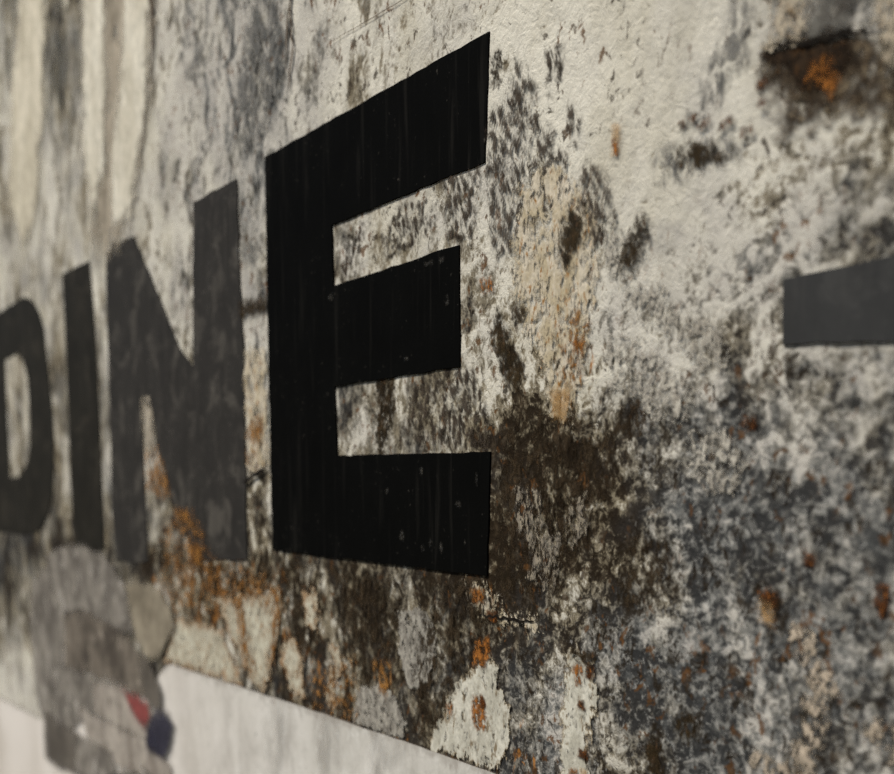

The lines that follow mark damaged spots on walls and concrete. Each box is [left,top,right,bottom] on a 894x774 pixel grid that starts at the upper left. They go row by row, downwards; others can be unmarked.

corrosion [677,113,733,131]
corrosion [756,76,770,107]
leakage [487,307,526,392]
corrosion [141,396,169,499]
leakage [374,368,654,607]
corrosion [158,507,278,623]
leakage [614,529,680,612]
leakage [634,736,665,774]
leakage [674,704,699,745]